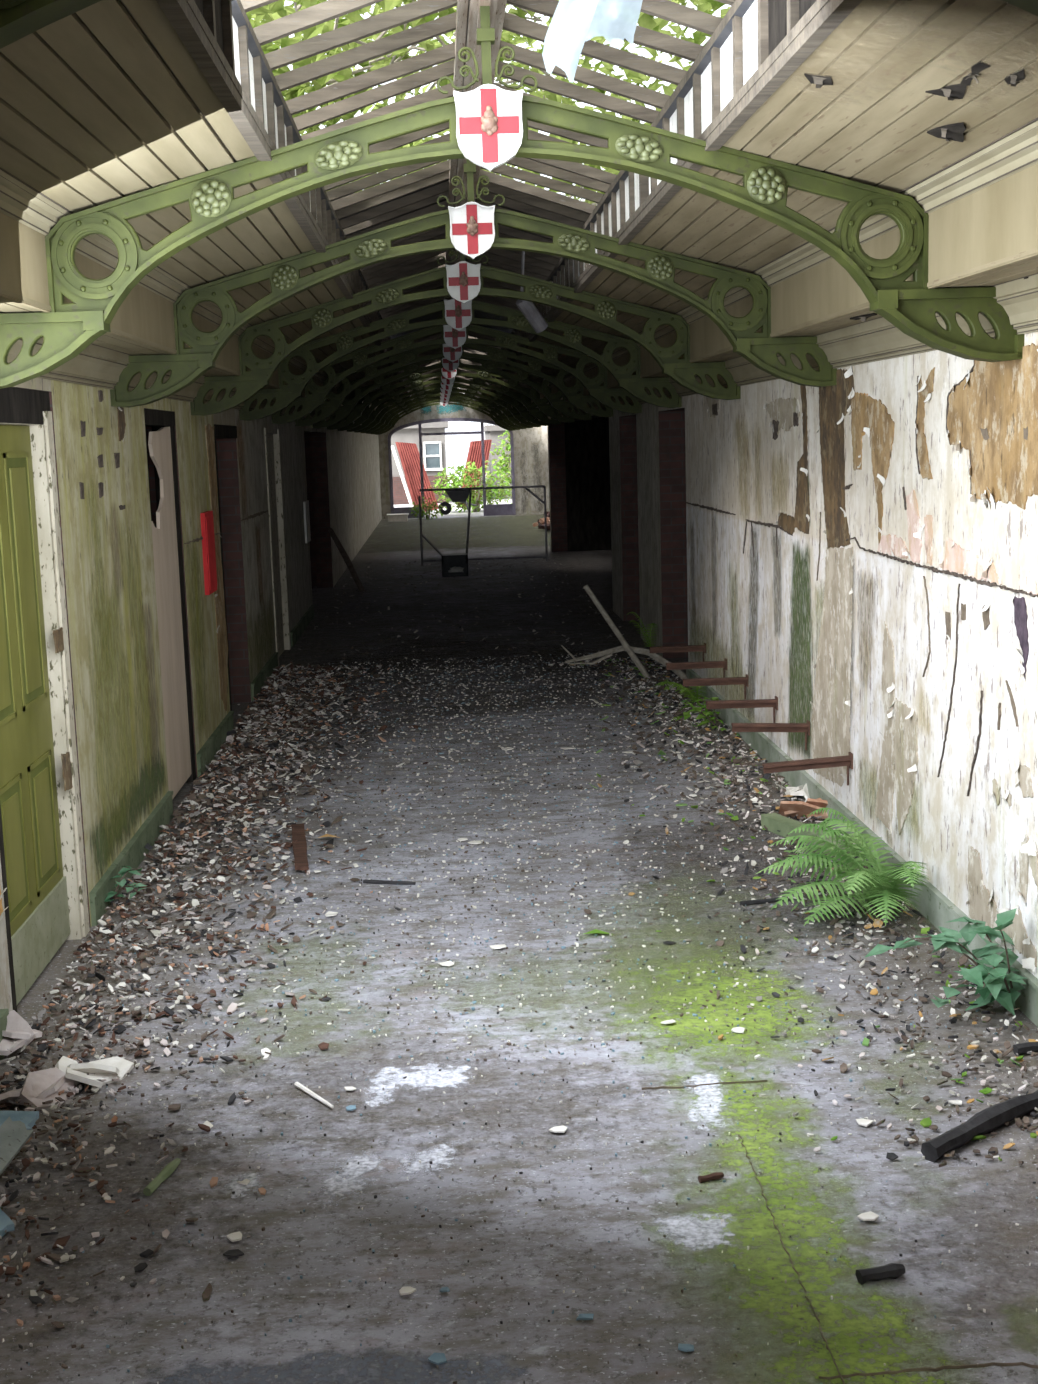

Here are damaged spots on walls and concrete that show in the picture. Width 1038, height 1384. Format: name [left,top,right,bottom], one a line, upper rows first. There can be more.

damp [712,520,813,759]
damp [849,568,873,732]
peeling [875,621,919,835]
peeling [764,343,1038,787]
peeling [991,760,1034,809]
peeling [966,834,1038,973]
crack [642,1080,767,1090]
crack [738,1134,1038,1384]